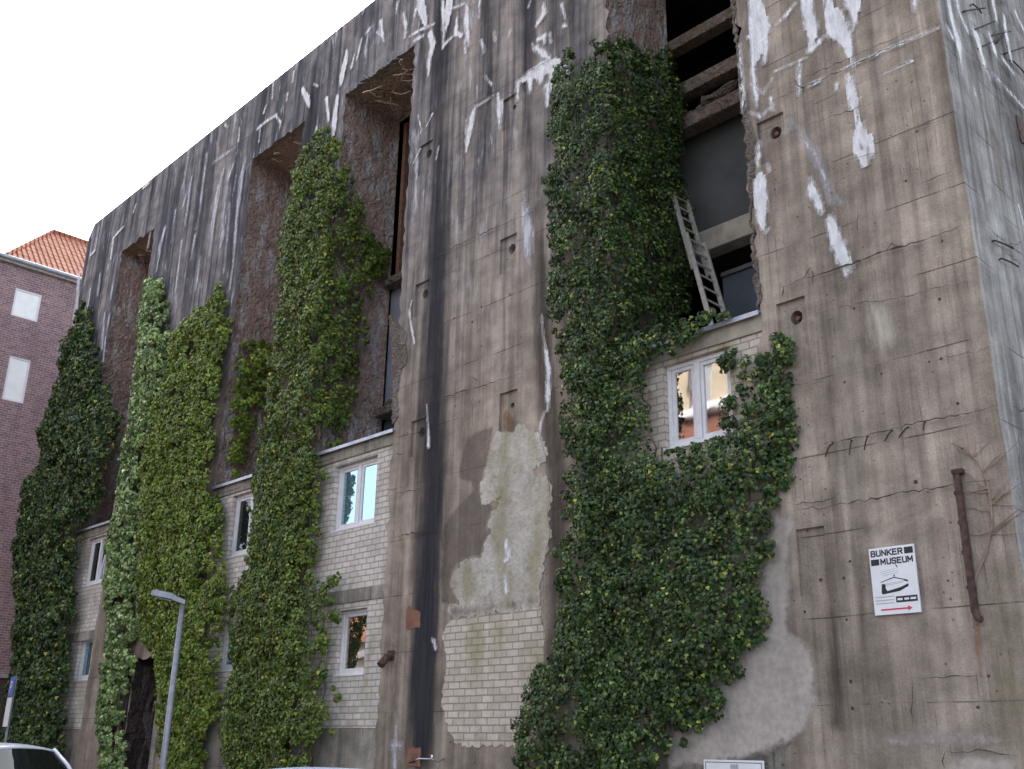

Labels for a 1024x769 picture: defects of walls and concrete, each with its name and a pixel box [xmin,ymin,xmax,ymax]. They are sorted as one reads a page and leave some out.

water stain [391,0,503,769]
peeling [441,423,553,748]
spalling [730,0,763,308]
crack [781,227,957,296]
crack [787,477,999,513]
crack [811,405,1024,463]